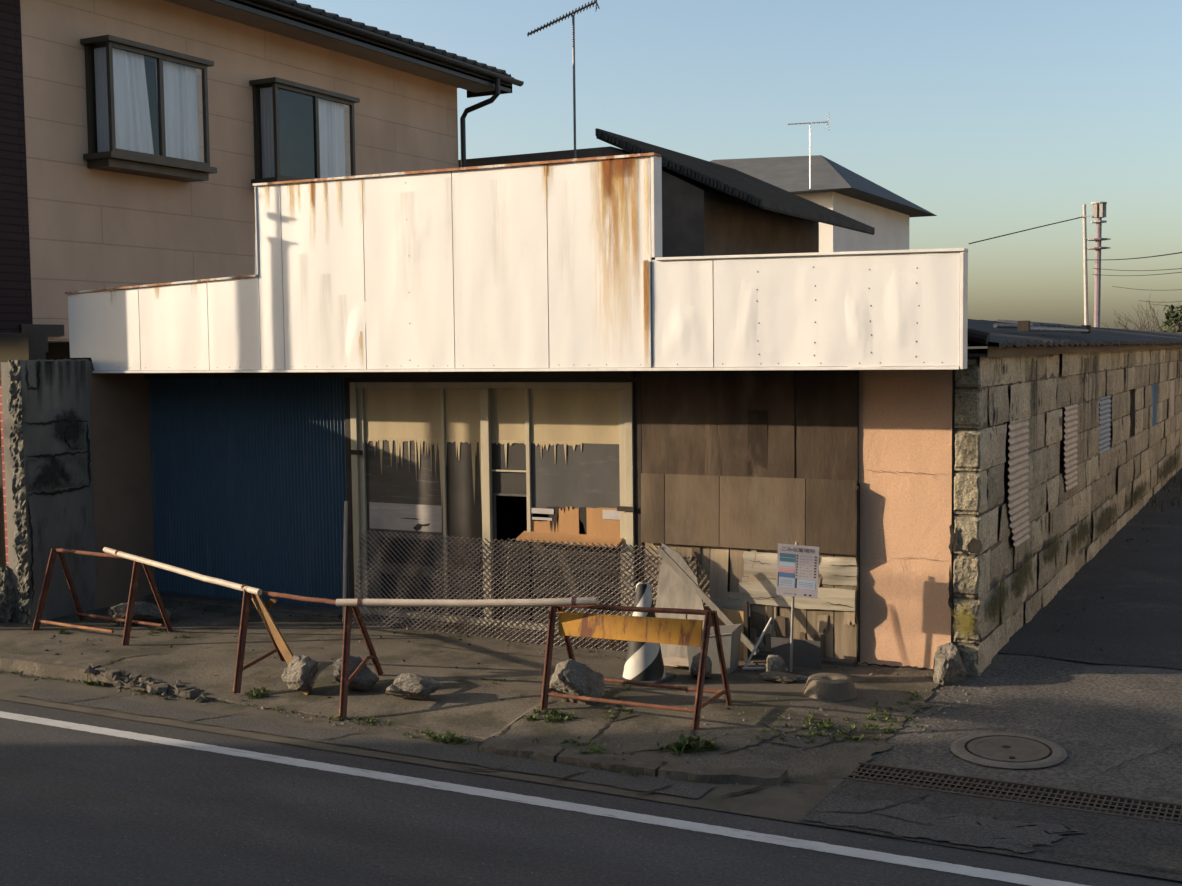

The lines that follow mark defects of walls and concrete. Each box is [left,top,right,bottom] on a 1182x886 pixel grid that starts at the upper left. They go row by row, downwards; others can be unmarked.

rust [289,180,340,207]
rust [601,157,648,230]